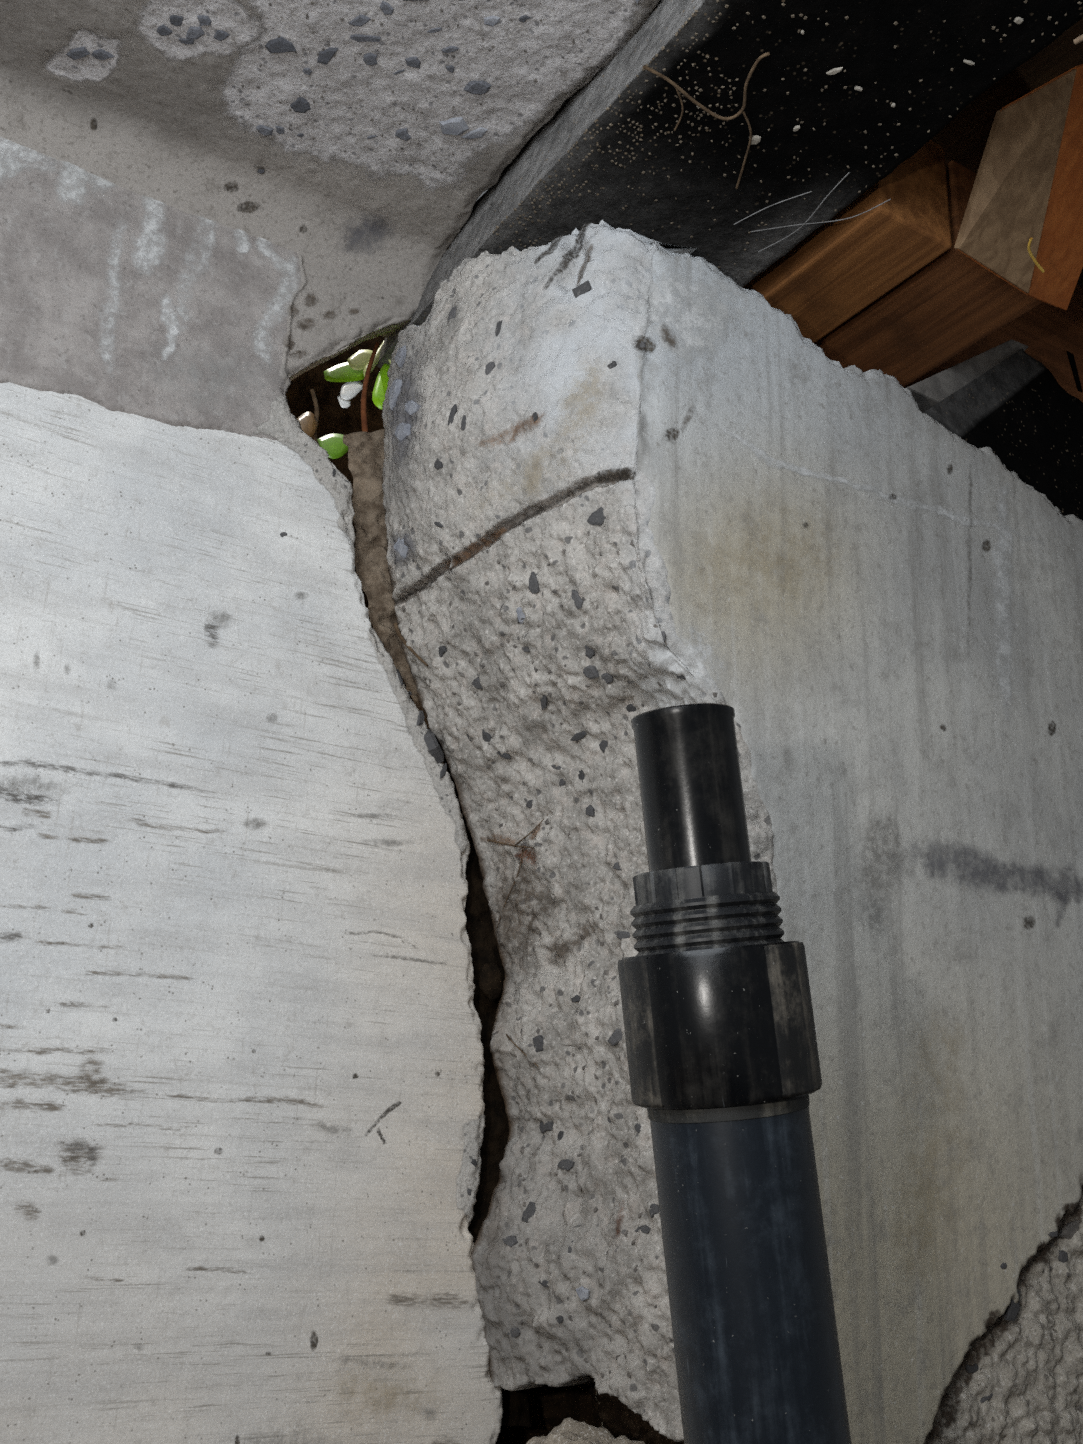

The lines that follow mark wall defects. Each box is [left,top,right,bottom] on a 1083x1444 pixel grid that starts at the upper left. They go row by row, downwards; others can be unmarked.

damp [634,268,747,362]
crack [343,429,635,705]
damp [635,630,721,709]
damp [715,425,1034,716]
crack [350,736,510,1243]
damp [928,848,1082,921]
crack [501,1389,532,1427]
spalling [924,1185,1083,1444]